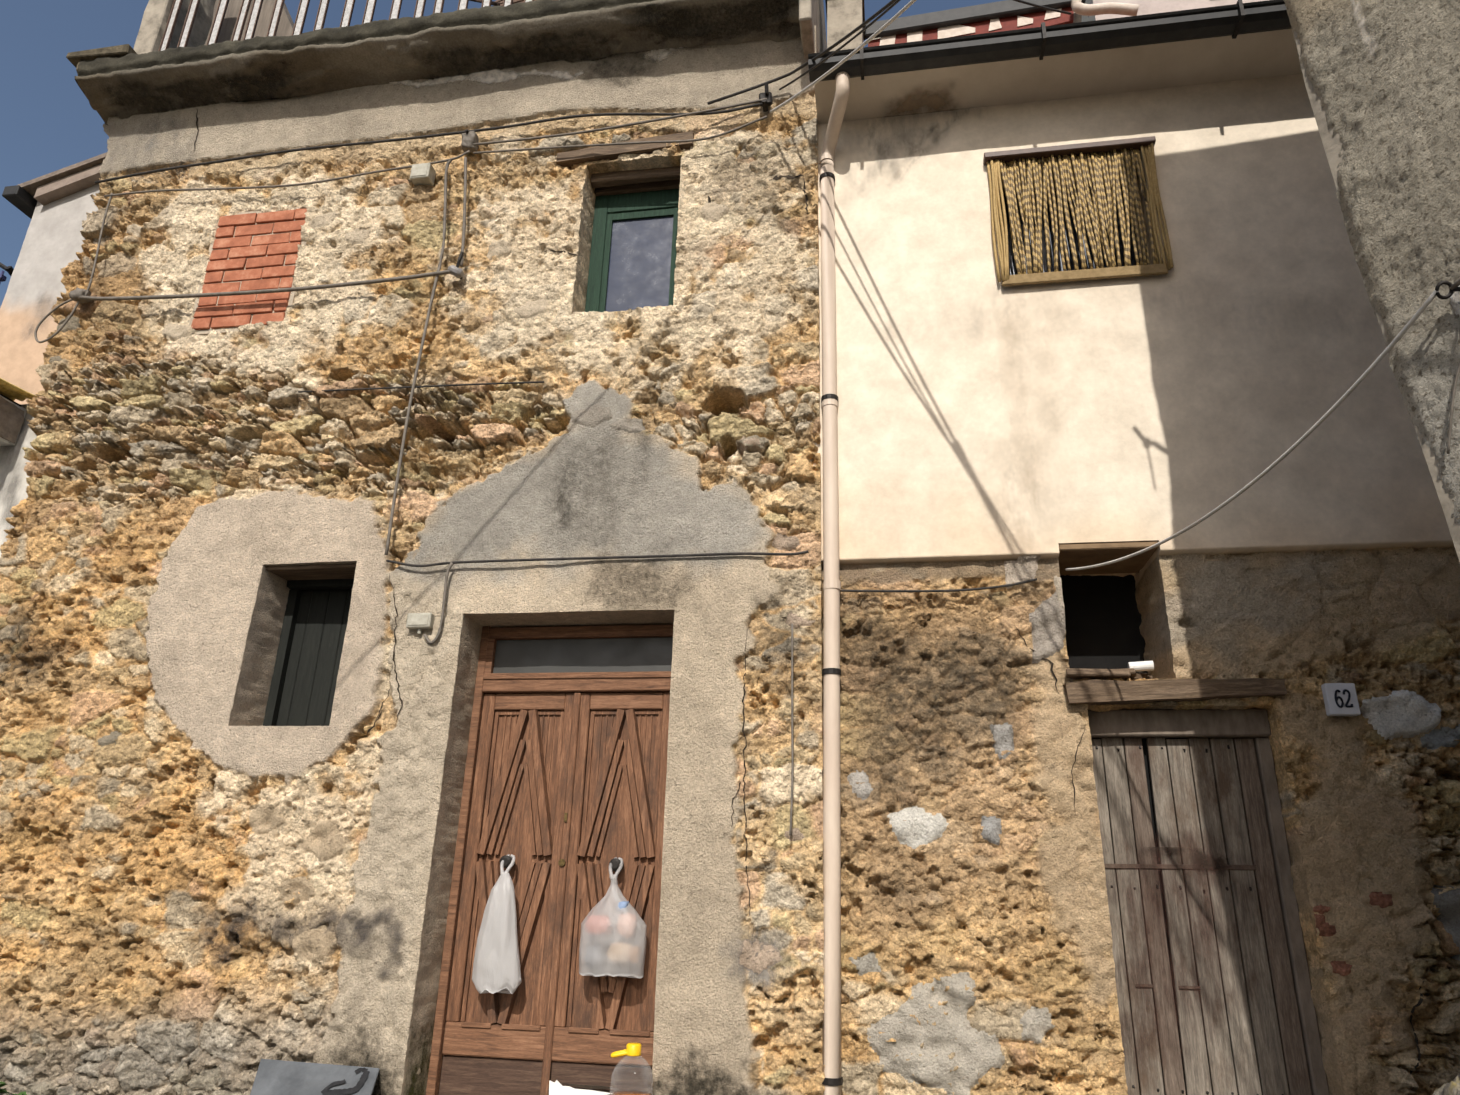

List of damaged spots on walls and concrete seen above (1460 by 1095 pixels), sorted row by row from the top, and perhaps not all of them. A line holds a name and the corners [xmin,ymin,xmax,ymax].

leakage [632,0,797,44]
leakage [423,31,642,80]
leakage [890,91,949,115]
crack [192,110,200,151]
leakage [655,1052,748,1095]